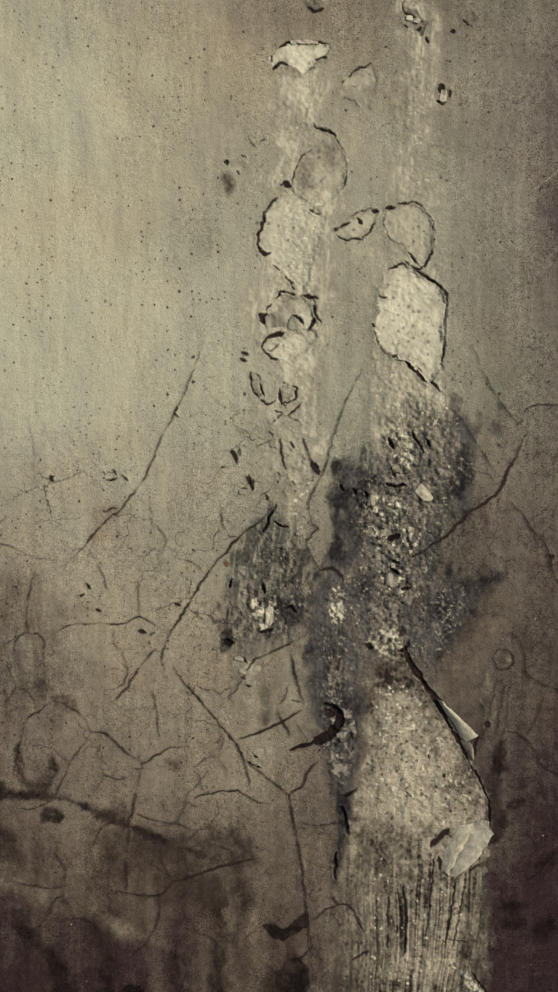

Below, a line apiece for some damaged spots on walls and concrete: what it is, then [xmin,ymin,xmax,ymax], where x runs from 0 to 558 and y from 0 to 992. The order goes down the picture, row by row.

peeling [269,39,330,74]
peeling [256,125,346,361]
peeling [334,201,448,391]
peeling [229,351,311,633]
crack [413,355,558,583]
damp [0,744,64,823]
damp [77,802,254,937]
crack [9,357,369,961]
damp [263,912,309,941]
damp [266,957,309,992]
peeling [320,398,494,992]
damp [488,743,524,843]